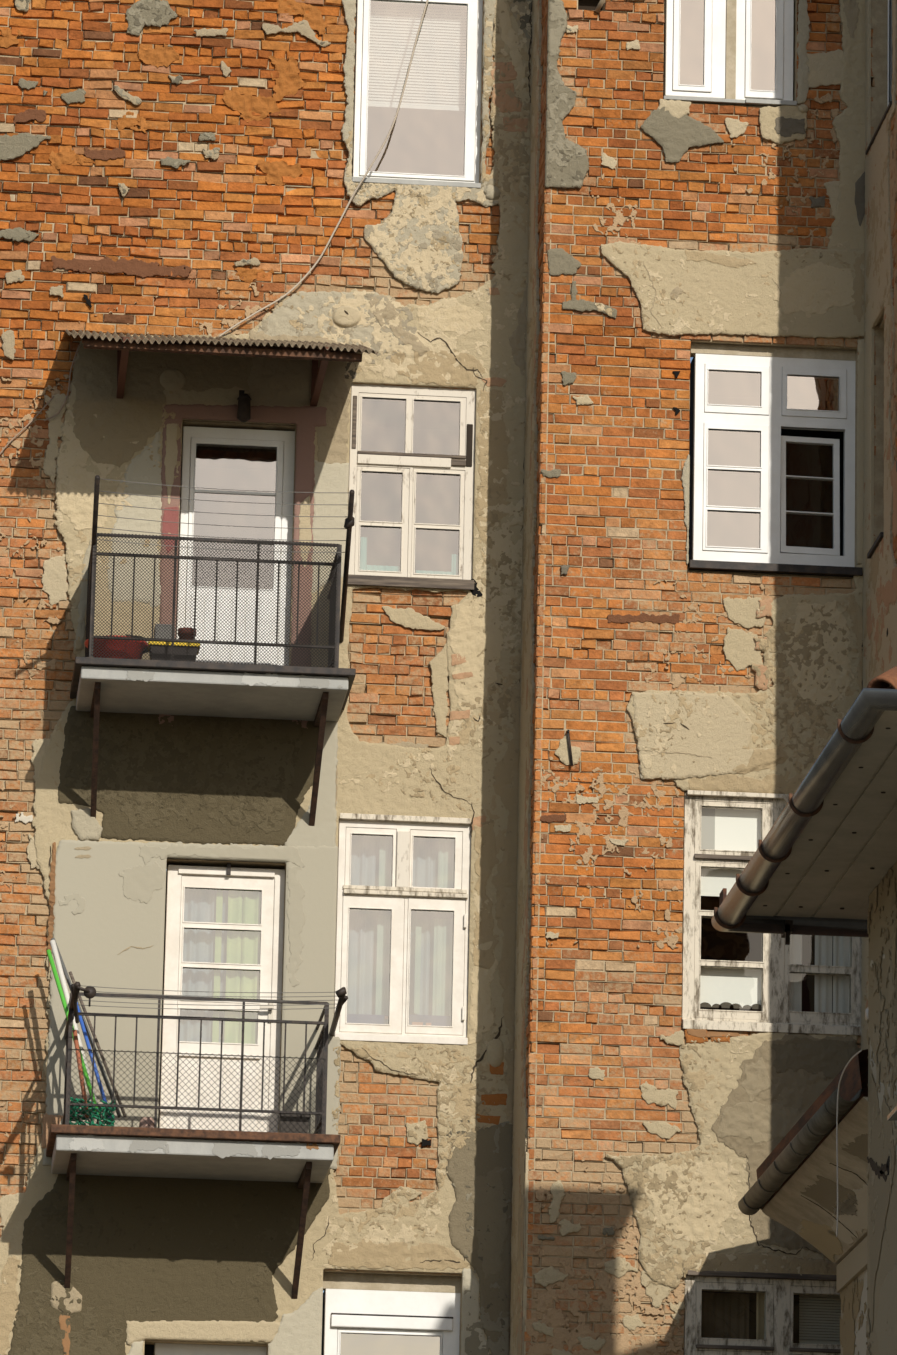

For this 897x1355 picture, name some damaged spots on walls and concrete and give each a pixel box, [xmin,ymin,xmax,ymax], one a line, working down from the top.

spalling [277,0,327,36]
spalling [268,55,307,102]
crack [418,333,487,391]
peeling [684,1029,730,1044]